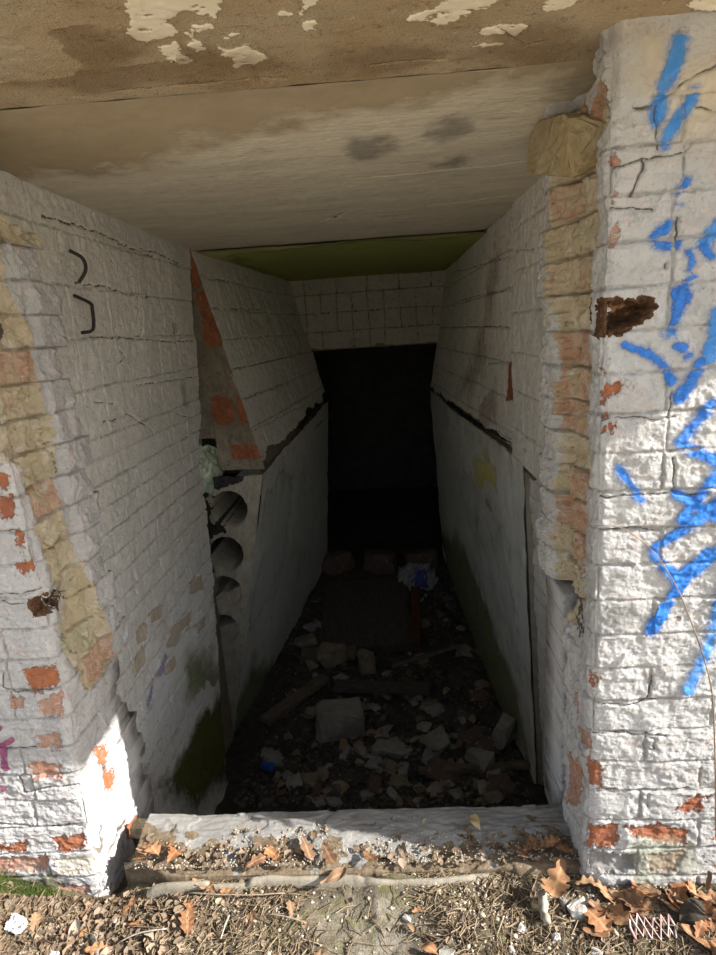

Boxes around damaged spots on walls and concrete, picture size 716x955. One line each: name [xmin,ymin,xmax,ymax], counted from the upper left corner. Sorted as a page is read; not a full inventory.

peeling [124,0,268,69]
peeling [406,0,500,25]
water stain [0,71,478,175]
crack [610,65,716,211]
spalling [542,80,659,626]
crack [250,393,325,432]
spalling [0,213,116,691]
peeling [9,663,64,718]
peeling [564,691,604,813]
peeling [675,792,712,814]
peeling [0,832,102,894]
peeling [584,821,690,875]